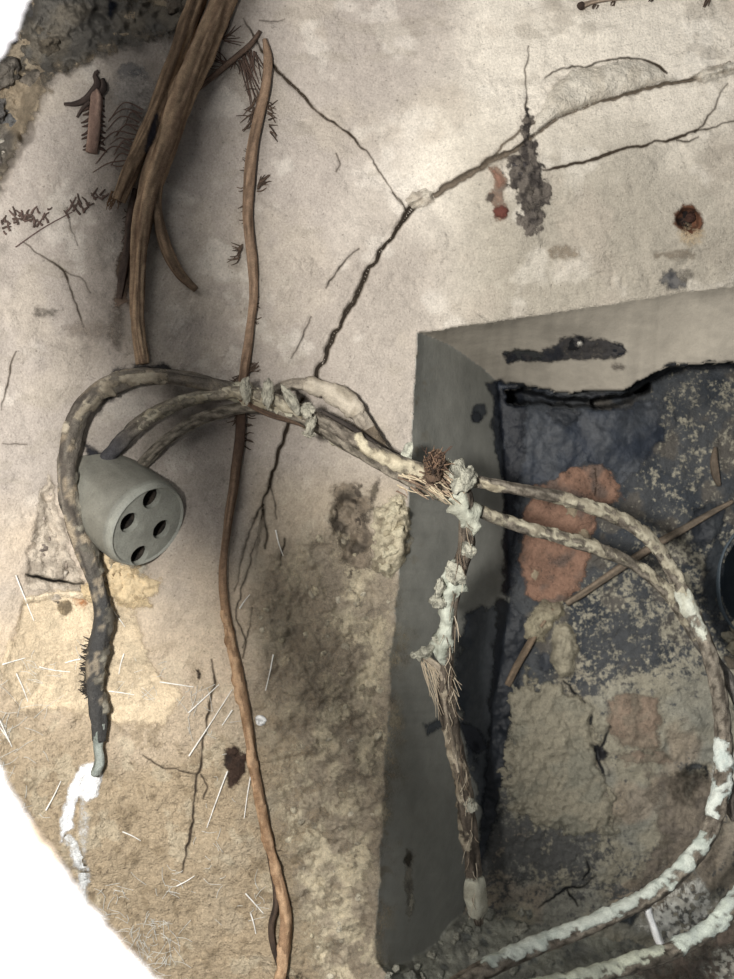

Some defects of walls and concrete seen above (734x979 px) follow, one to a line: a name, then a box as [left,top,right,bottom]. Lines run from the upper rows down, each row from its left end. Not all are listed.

crack [248,27,696,378]
rust [486,166,509,221]
damp [506,108,552,236]
crack [542,92,734,171]
rust [673,204,703,243]
crack [235,397,304,659]
crack [146,659,216,873]
damp [60,799,90,902]